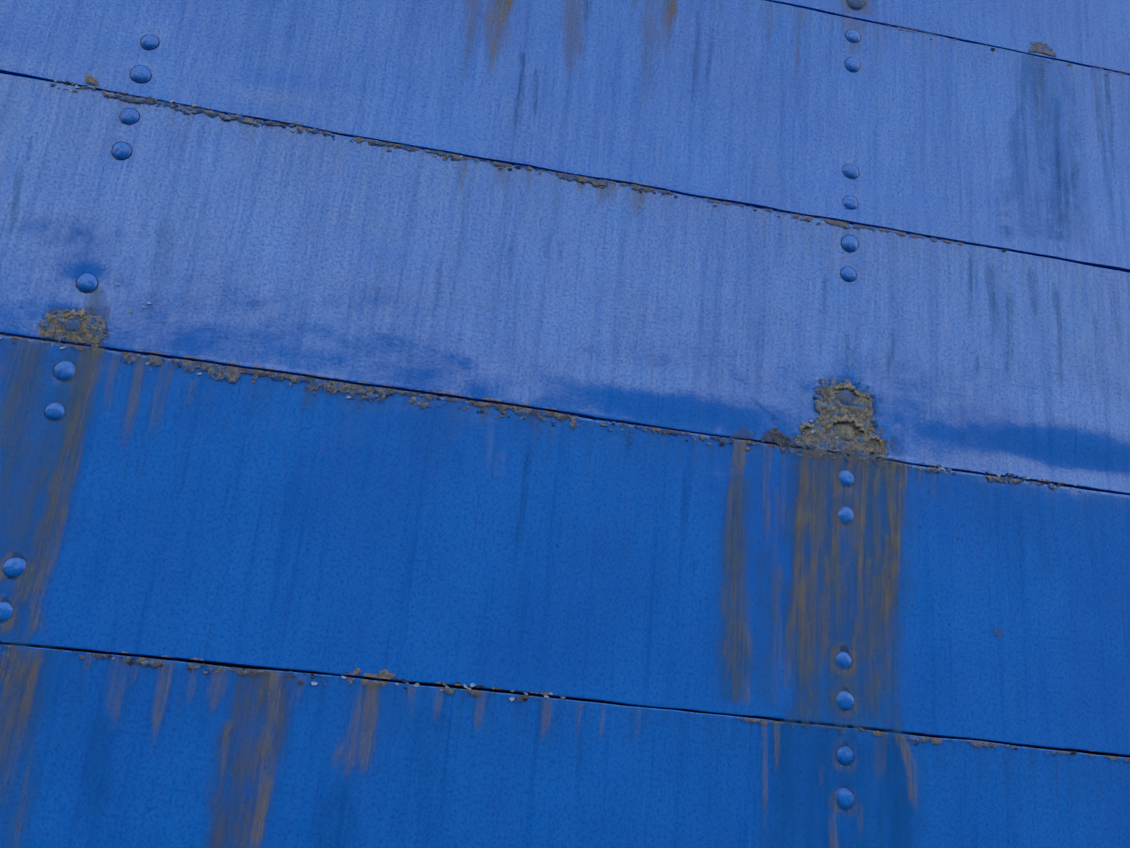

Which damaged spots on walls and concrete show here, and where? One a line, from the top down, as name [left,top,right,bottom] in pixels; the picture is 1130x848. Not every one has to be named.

corrosion [0,349,100,629]
corrosion [786,450,907,731]
corrosion [214,773,270,848]